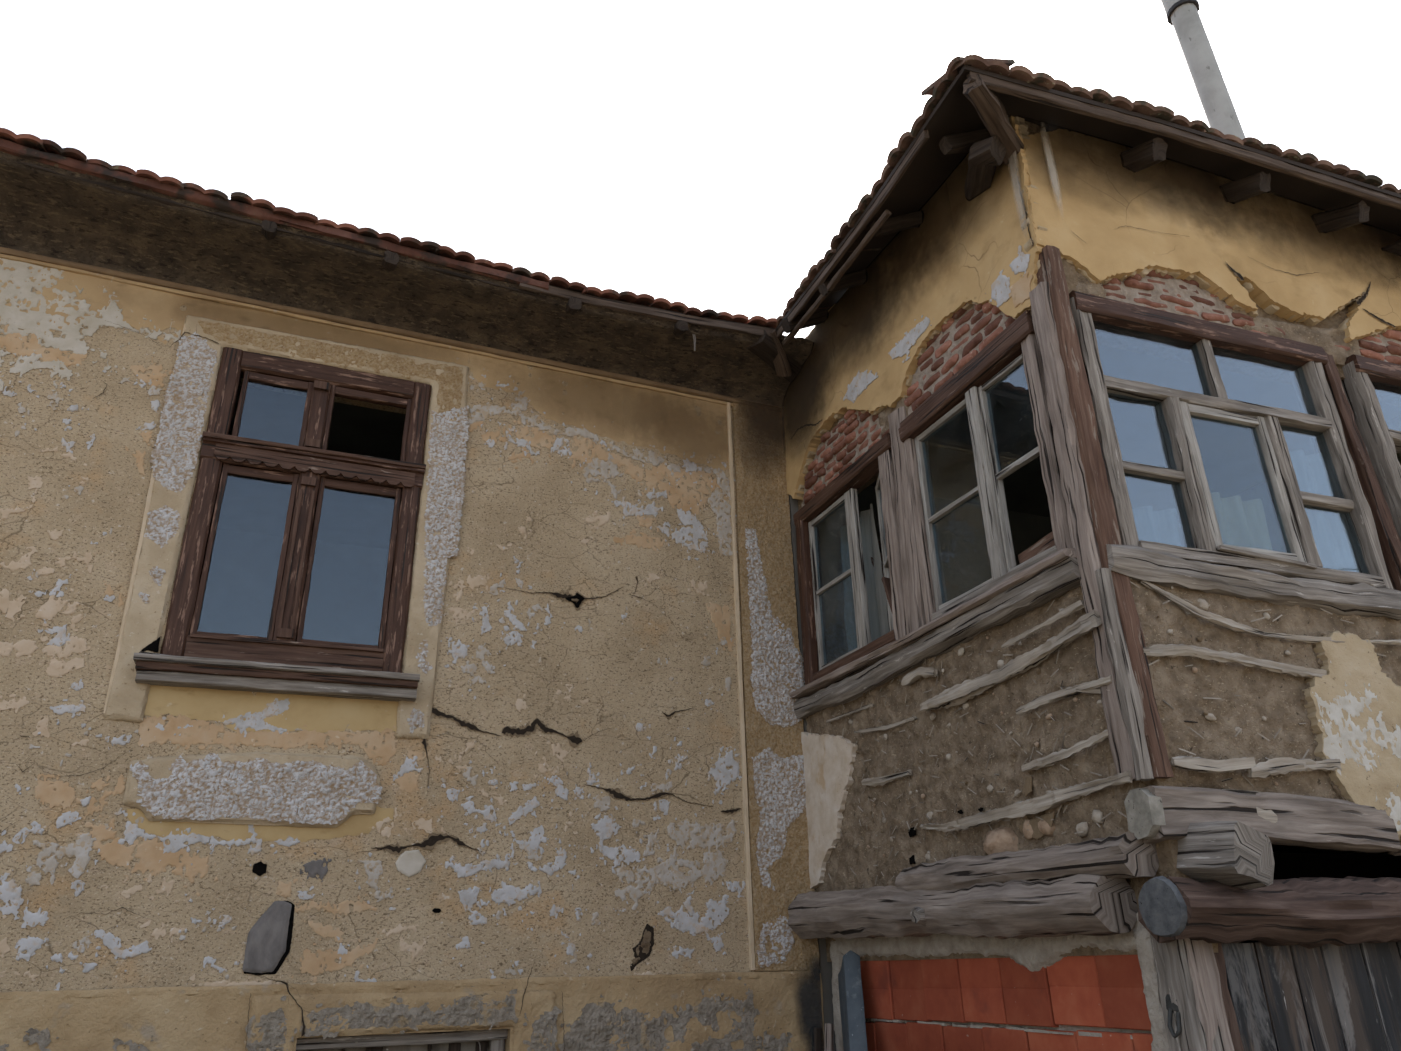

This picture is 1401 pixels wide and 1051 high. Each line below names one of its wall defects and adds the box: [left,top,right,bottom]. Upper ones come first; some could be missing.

peeling [985,245,1033,313]
crack [1226,257,1319,281]
crack [1356,281,1396,328]
peeling [888,315,932,363]
crack [507,576,666,621]
flaking render [415,369,1151,892]
flaking render [1130,578,1401,801]
crack [422,706,605,787]
flaking render [0,528,806,1051]
crack [585,784,741,814]
peeling [1375,785,1401,835]
crack [343,830,482,860]